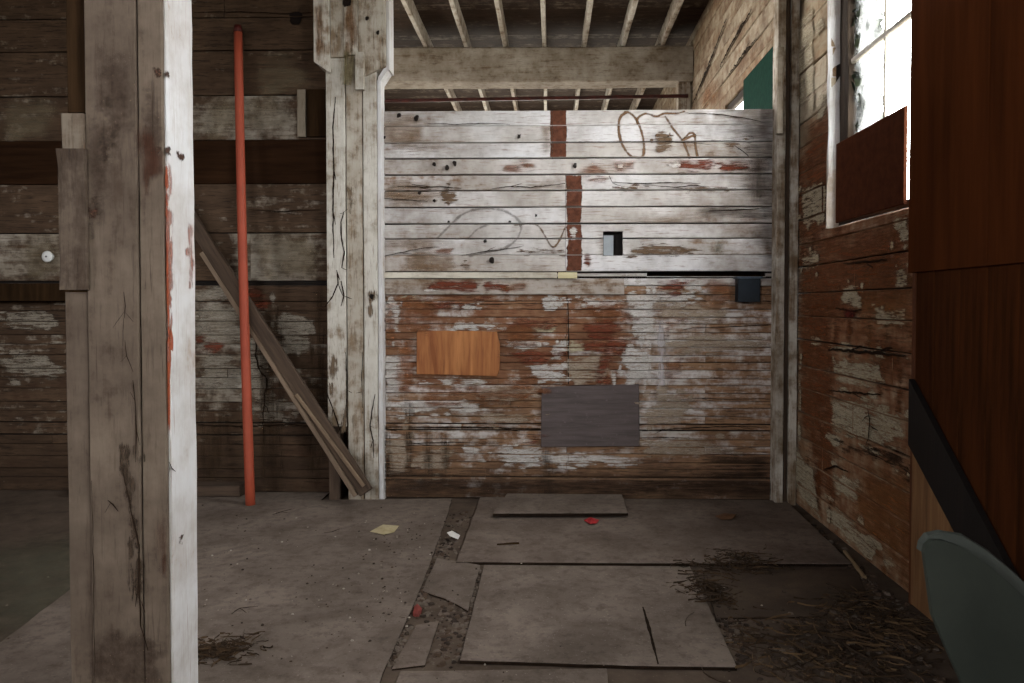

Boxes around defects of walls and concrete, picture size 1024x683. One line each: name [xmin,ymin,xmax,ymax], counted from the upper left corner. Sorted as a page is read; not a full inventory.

crack [620,10,761,157]
crack [248,97,352,307]
peeling [798,183,826,229]
peeling [890,214,908,250]
peeling [800,247,819,277]
peeling [0,302,65,331]
peeling [840,279,905,329]
peeling [0,346,66,386]
peeling [368,243,771,481]
crack [828,345,906,357]
peeling [796,336,910,567]